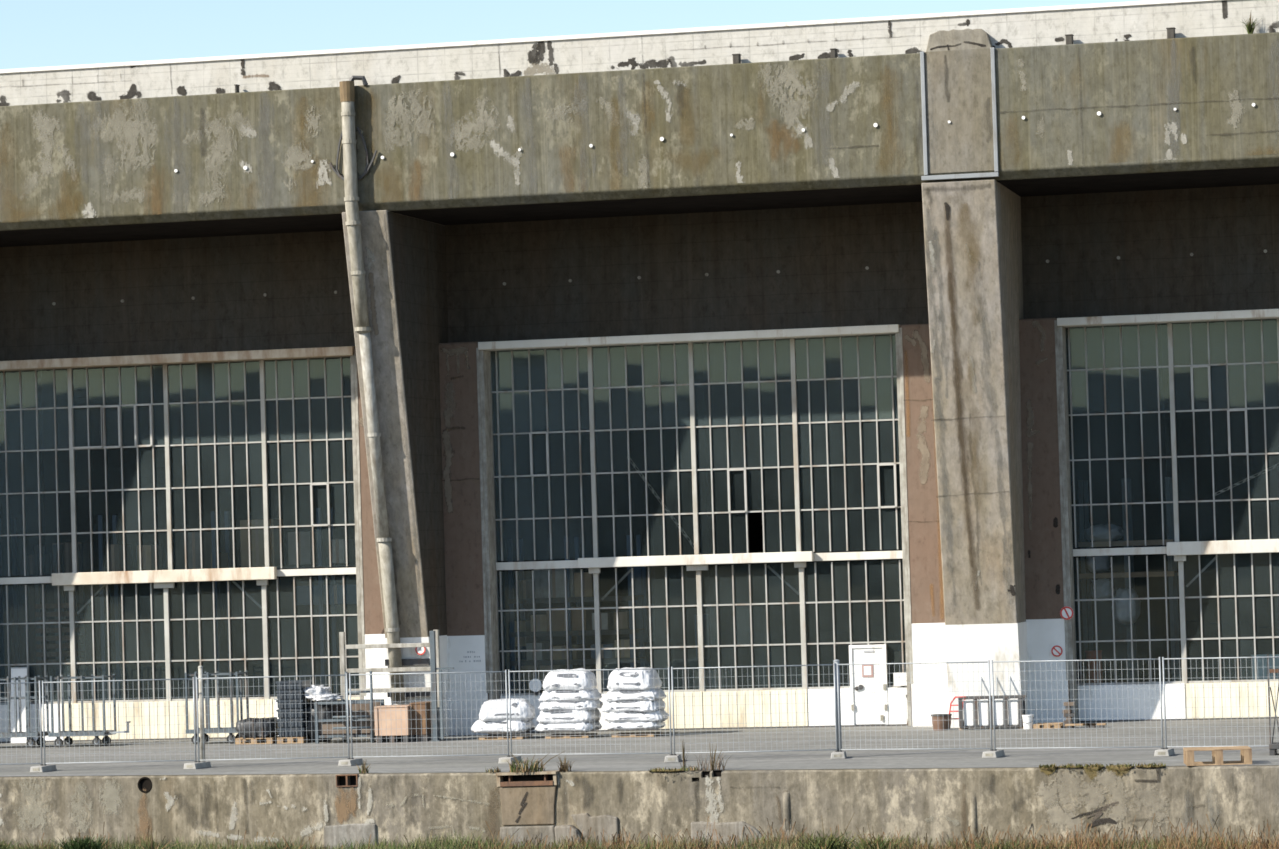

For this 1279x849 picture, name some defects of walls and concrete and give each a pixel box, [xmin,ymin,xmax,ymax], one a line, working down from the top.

spalling [503,41,559,77]
spalling [611,56,706,122]
peeling [763,49,853,148]
peeling [284,130,366,189]
peeling [1164,122,1187,160]
leakage [69,780,121,833]